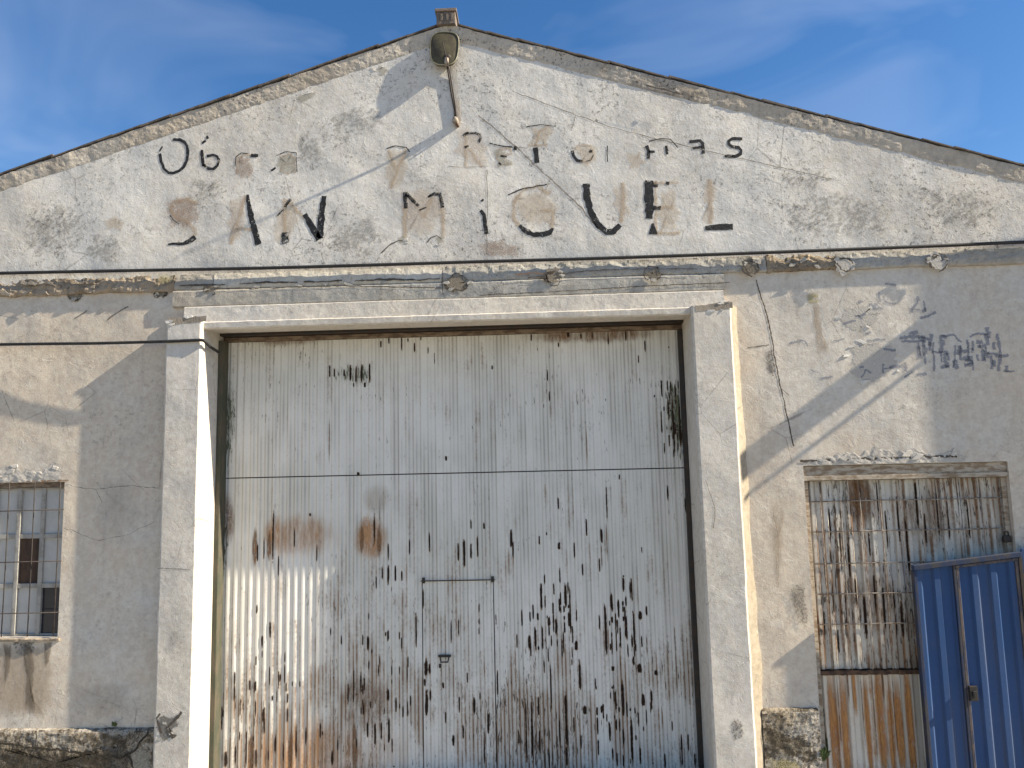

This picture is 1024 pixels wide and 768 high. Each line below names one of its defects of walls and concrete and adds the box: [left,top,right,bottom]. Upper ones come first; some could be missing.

flaking render [0,275,175,302]
crack [747,280,957,462]
flaking render [0,461,62,483]
flaking render [804,445,966,465]
corrosion [252,525,285,563]
corrosion [358,522,382,554]
corrosion [851,480,982,575]
corrosion [823,508,905,653]
damp [4,642,51,707]
corrosion [828,669,917,768]